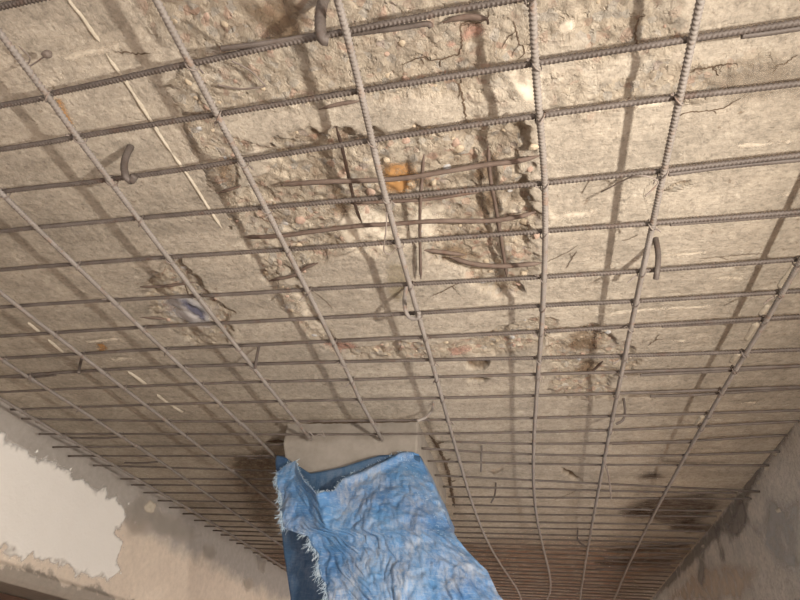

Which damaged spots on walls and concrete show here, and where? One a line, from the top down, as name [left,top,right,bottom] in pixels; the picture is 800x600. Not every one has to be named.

crack [400,12,489,68]
crack [690,63,733,76]
crack [680,97,742,116]
corrosion [386,165,413,192]
spalling [103,0,800,408]
flaking render [0,432,136,581]
leakage [597,437,785,599]